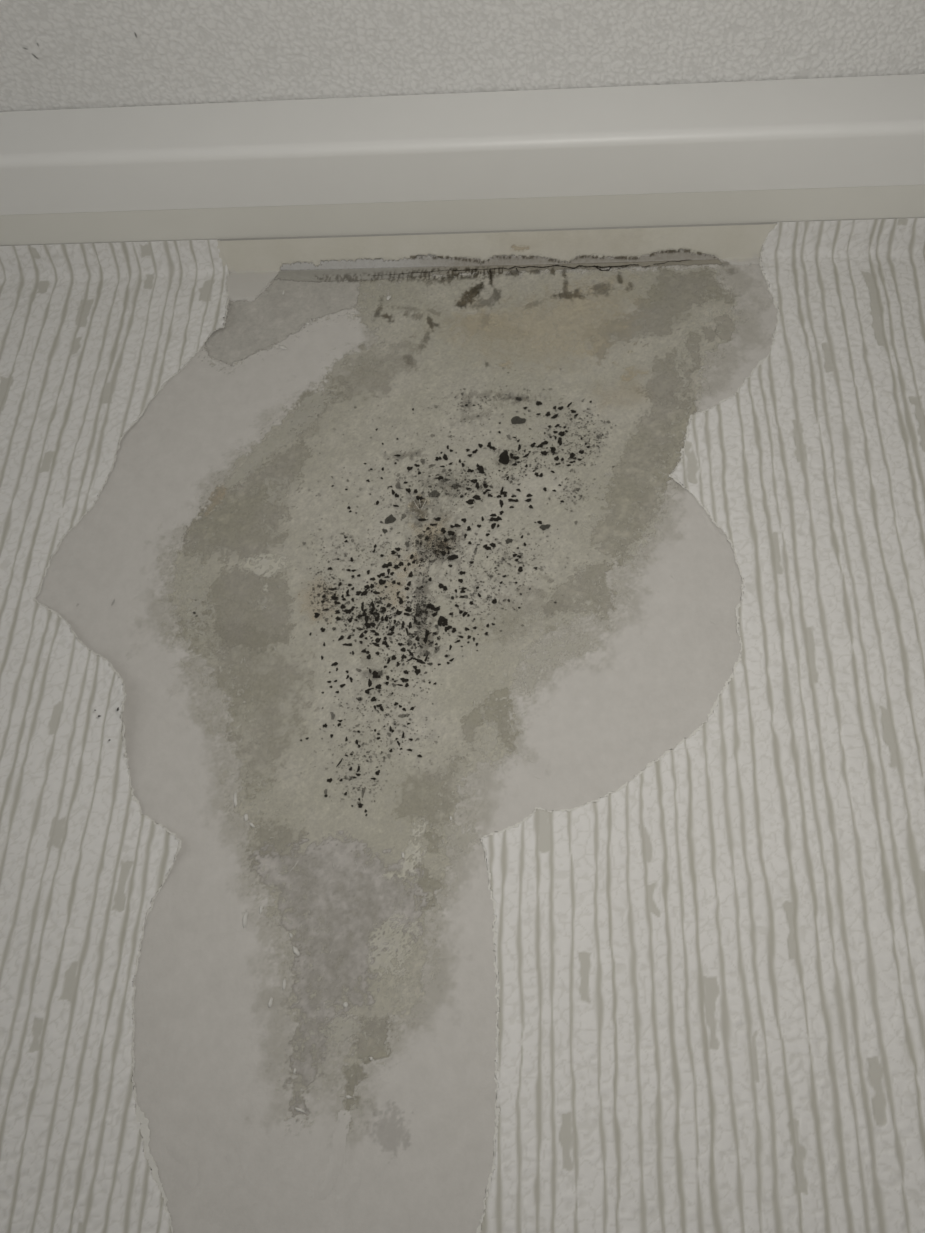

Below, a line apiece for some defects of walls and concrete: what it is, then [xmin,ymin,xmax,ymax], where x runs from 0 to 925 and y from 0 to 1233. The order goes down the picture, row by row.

peeling [36,260,743,1233]
damp [162,250,739,1120]
peeling [432,251,778,413]